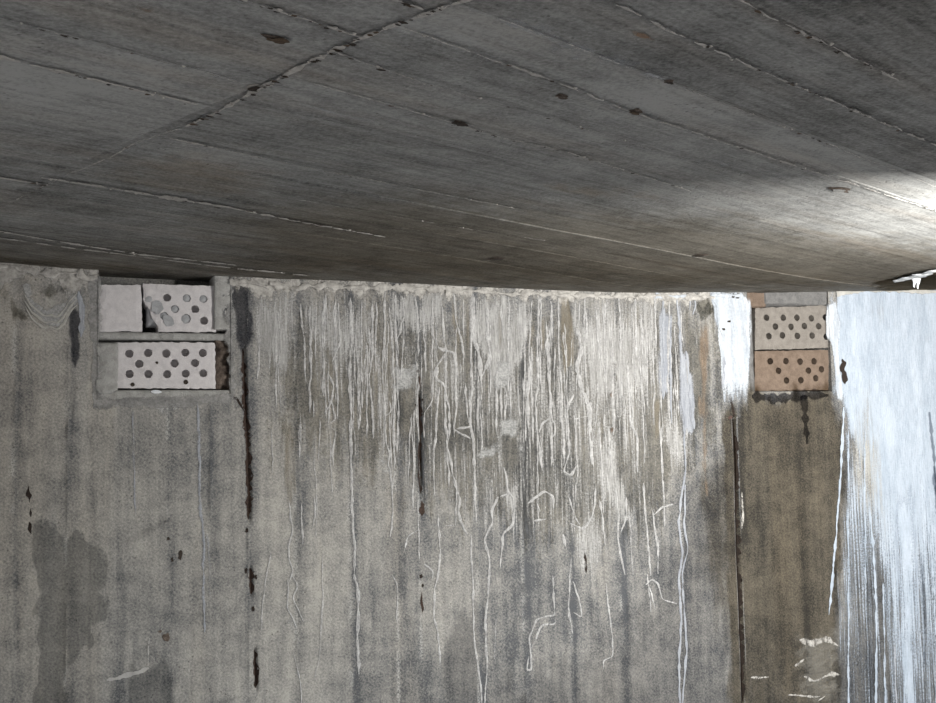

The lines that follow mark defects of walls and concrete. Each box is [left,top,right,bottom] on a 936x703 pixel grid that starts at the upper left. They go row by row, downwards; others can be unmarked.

damp [230,277,751,703]
damp [799,270,936,703]